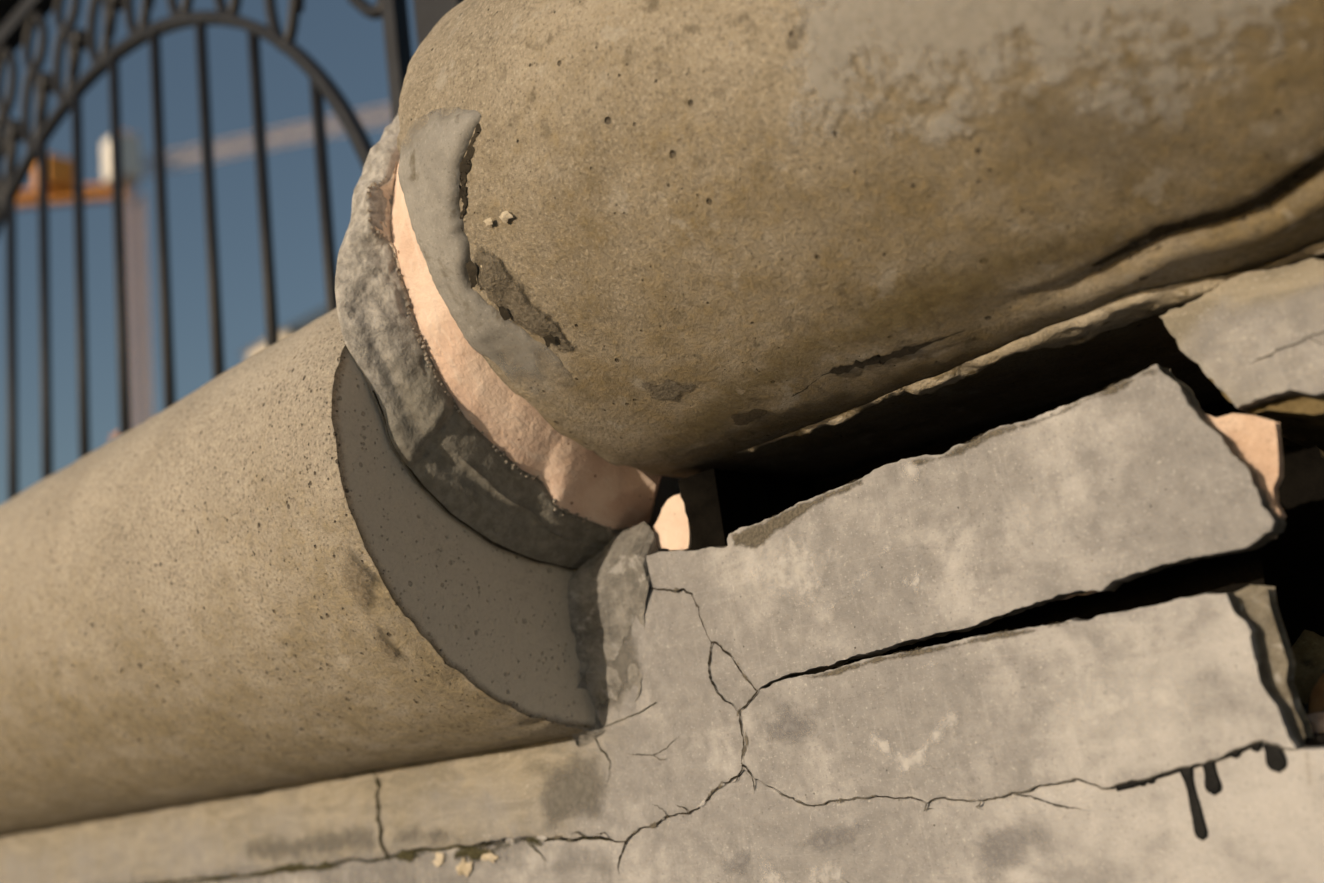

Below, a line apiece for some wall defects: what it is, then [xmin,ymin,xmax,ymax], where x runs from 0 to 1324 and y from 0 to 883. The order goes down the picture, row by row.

leakage [790,0,1287,135]
crack [1091,152,1324,267]
spalling [365,176,634,532]
crack [791,330,965,397]
crack [1251,332,1324,364]
spalling [642,364,1324,805]
crack [155,548,1295,883]